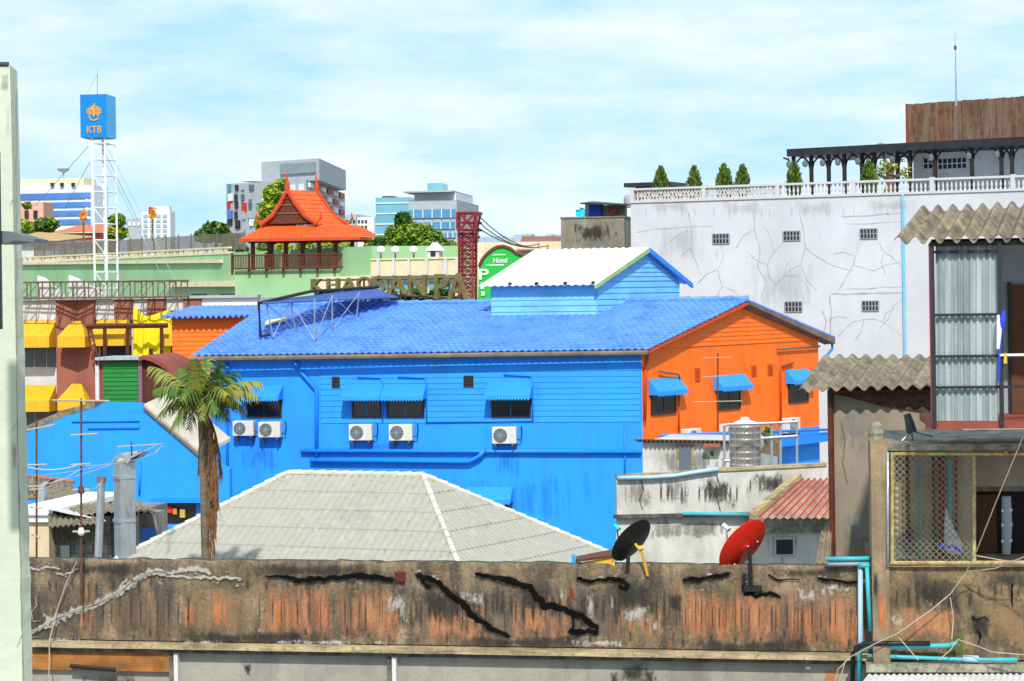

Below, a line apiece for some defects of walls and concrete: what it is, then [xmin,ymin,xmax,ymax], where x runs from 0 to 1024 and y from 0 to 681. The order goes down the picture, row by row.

water stain [574,225,616,239]
water stain [625,476,782,505]
water stain [65,562,152,620]
water stain [190,600,380,644]
corrosion [267,589,397,637]
crack [264,570,511,638]
corrosion [430,603,486,640]
crack [475,572,599,635]
corrosion [513,600,571,639]
crack [577,575,630,591]
corrosion [680,590,858,647]
crack [683,572,858,599]